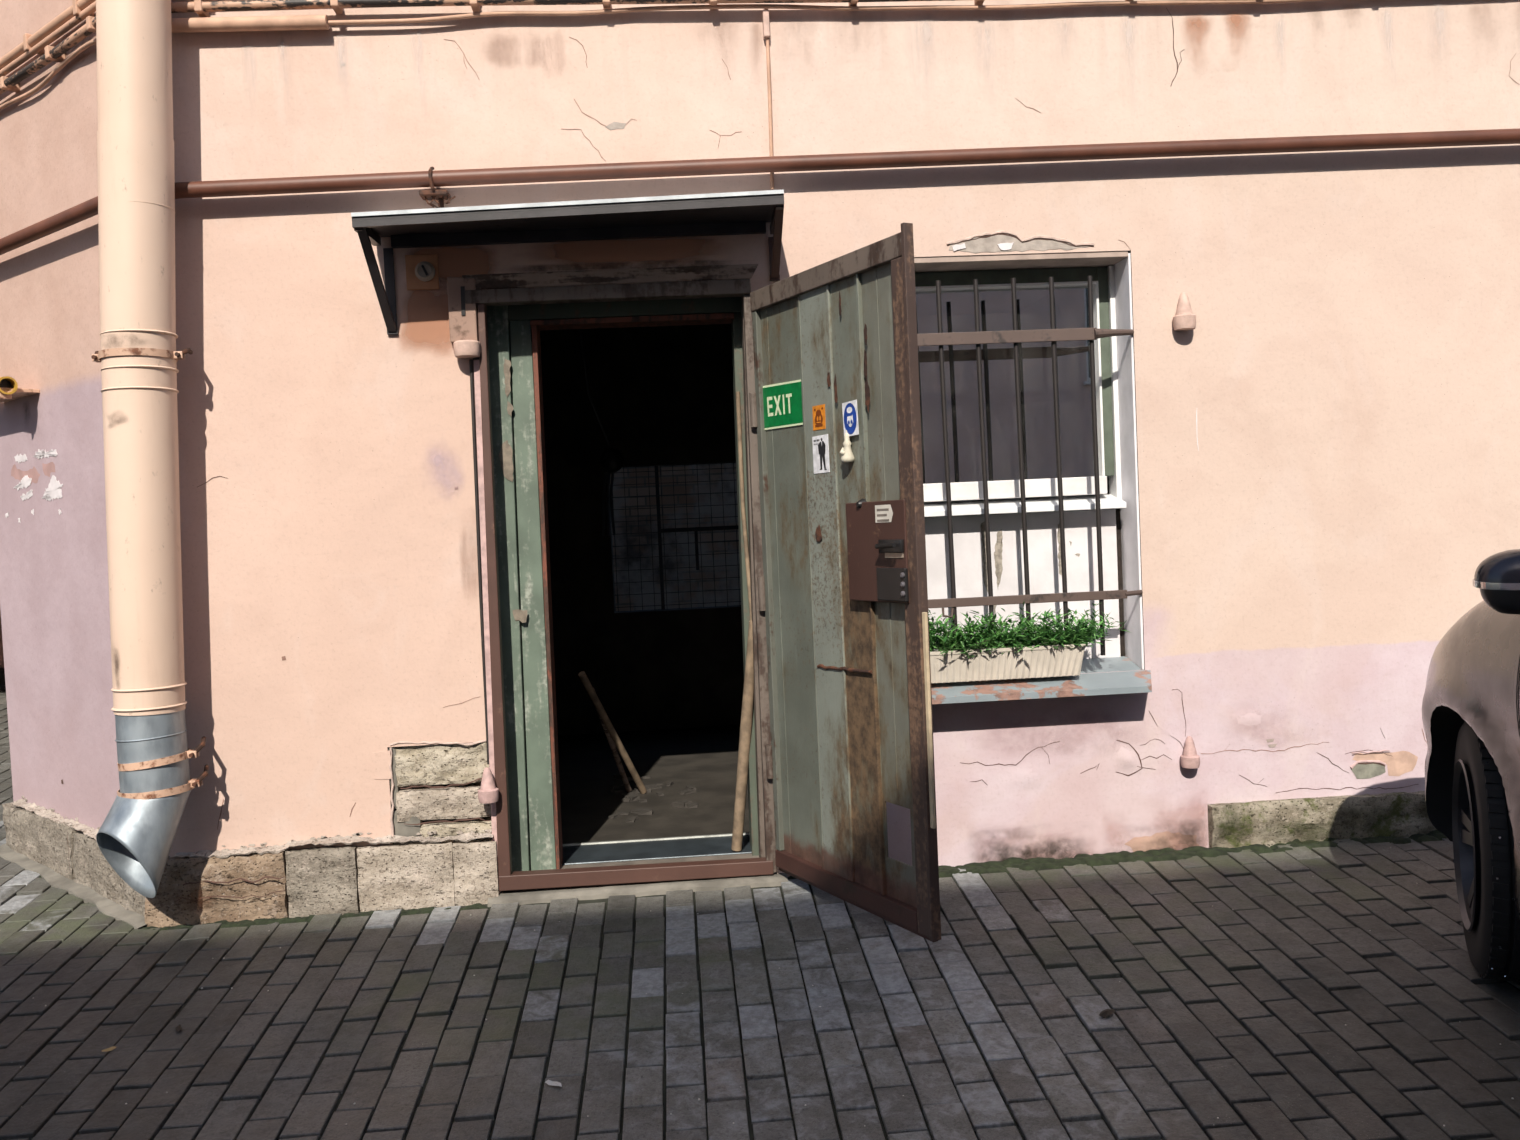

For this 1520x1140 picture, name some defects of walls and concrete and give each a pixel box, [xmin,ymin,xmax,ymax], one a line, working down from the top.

crack [1166,8,1185,85]
crack [566,99,635,156]
flaking render [946,231,1094,253]
peeling [5,449,63,522]
crack [964,741,1100,785]
crack [1137,689,1418,793]
flaking render [1350,750,1418,779]